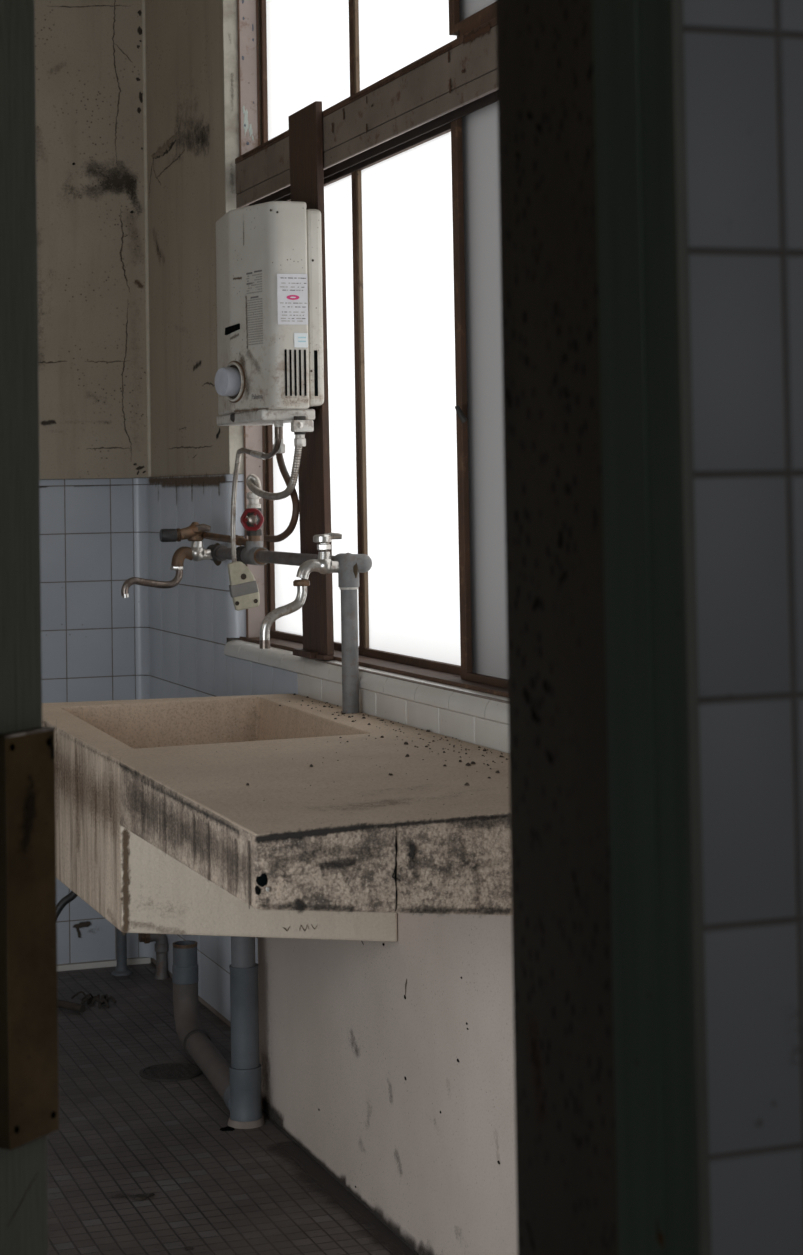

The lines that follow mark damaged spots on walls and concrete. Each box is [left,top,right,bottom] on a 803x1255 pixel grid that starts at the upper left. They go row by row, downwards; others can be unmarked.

crack [50,0,133,163]
crack [38,209,132,457]
damp [50,736,510,914]